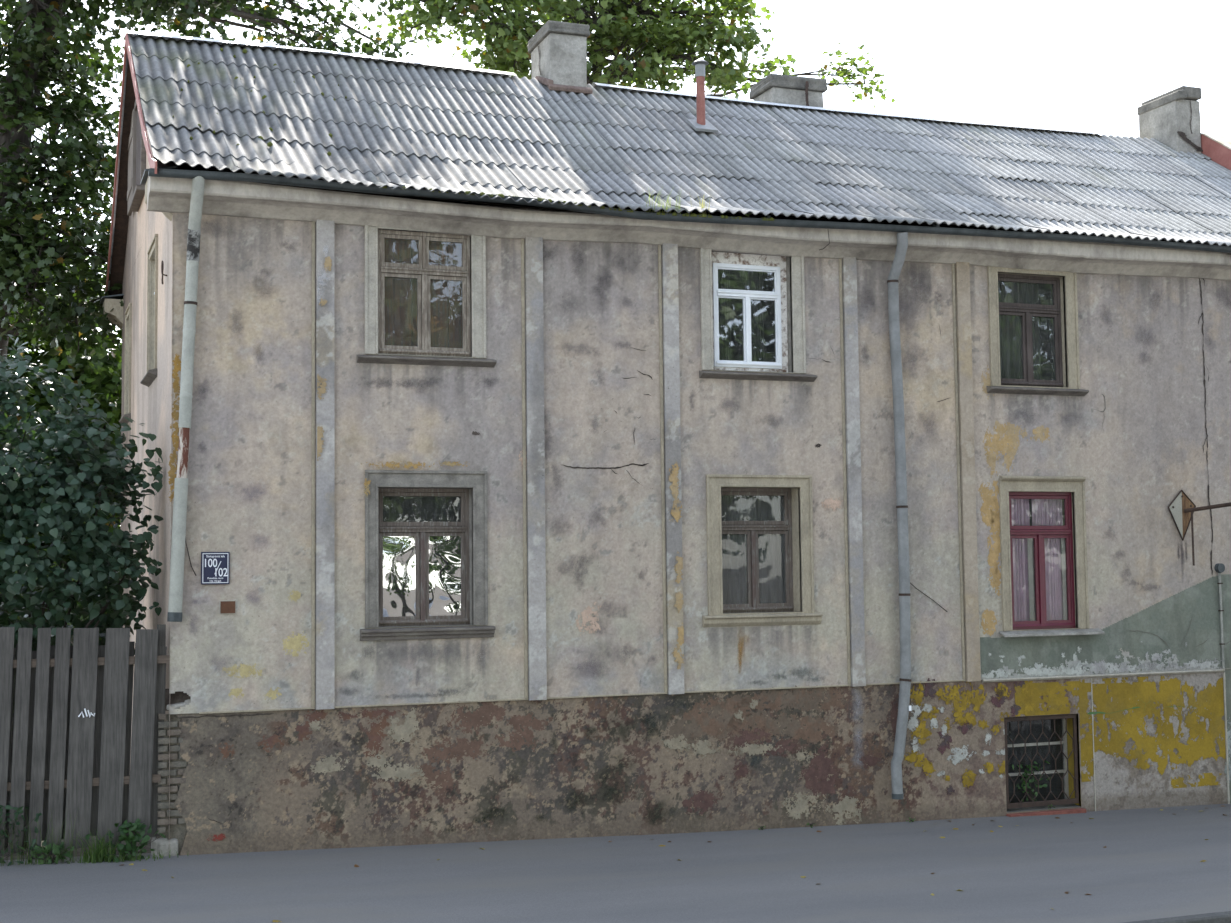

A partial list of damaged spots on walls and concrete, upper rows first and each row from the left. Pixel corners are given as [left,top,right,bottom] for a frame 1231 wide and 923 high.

crack [563,348,656,486]
peeling [668,459,682,523]
peeling [978,421,1050,636]
peeling [672,551,684,670]
flaking render [157,687,282,857]
peeling [258,699,553,798]
peeling [889,642,1222,797]